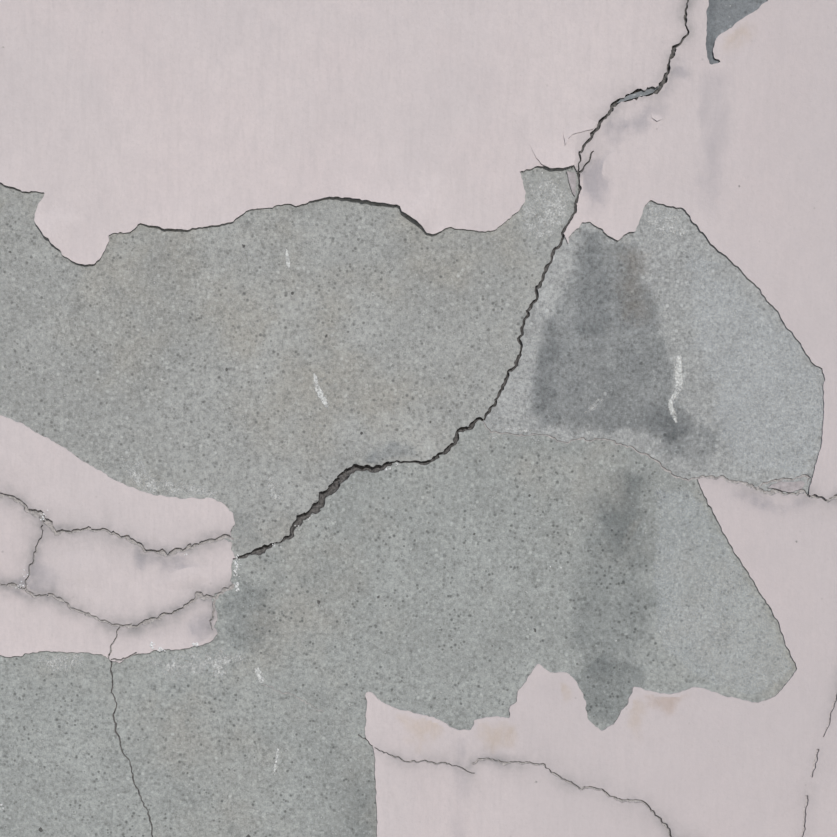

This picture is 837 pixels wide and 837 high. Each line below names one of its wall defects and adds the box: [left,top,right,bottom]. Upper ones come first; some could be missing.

peeling [706,0,767,65]
crack [233,0,837,560]
efflorescence [668,355,683,422]
peeling [0,165,825,837]
crack [0,492,235,837]
crack [358,734,672,837]
crack [800,691,837,837]